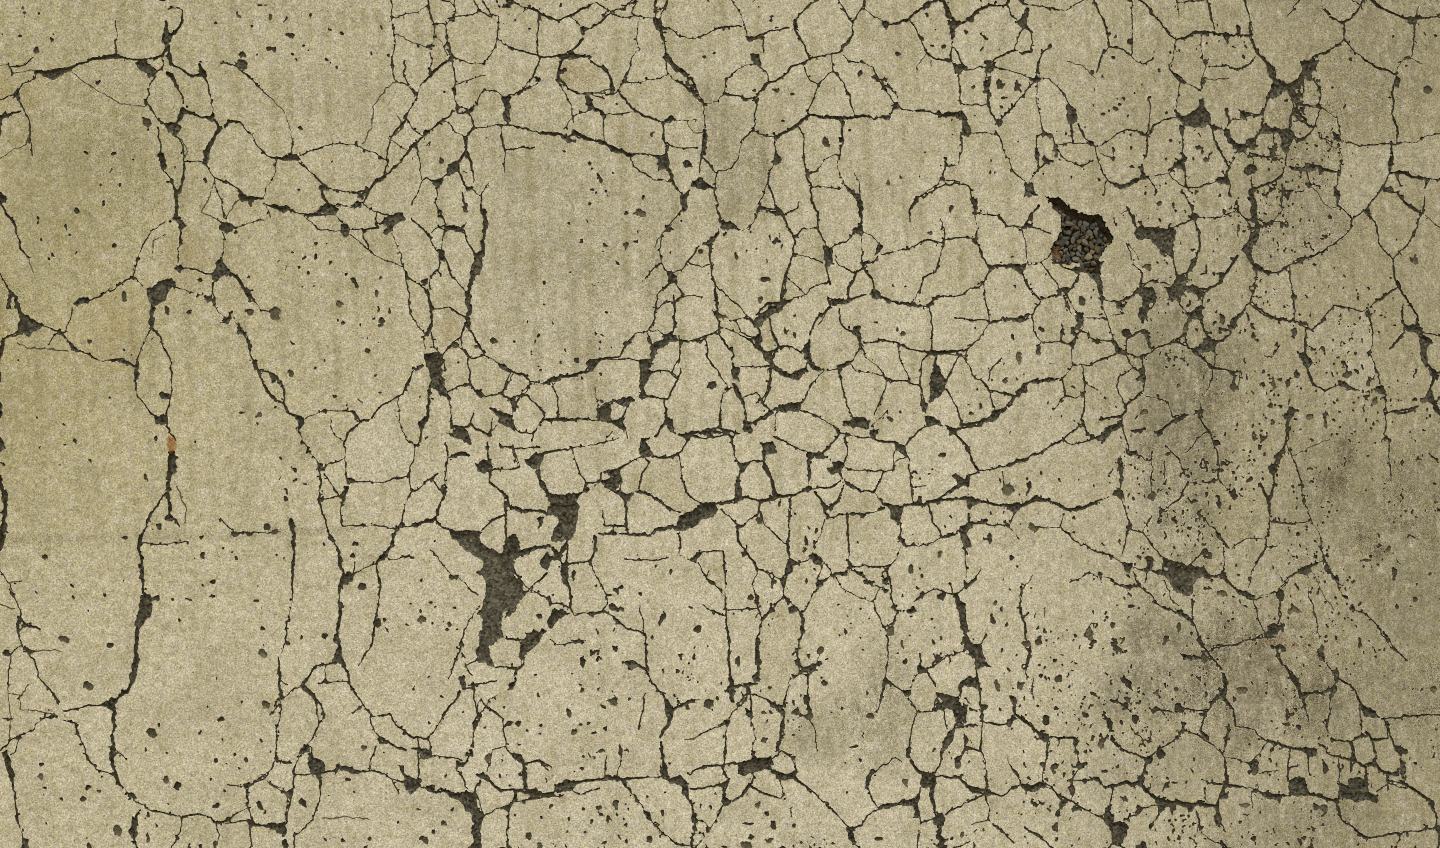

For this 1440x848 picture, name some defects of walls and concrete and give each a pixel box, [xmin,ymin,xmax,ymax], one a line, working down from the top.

spalling [237,4,309,70]
spalling [916,12,1000,70]
crack [0,570,61,848]
crack [0,6,295,441]
crack [63,450,293,848]
crack [293,676,786,848]
spalling [546,503,579,542]
spalling [734,233,783,304]
crack [235,0,1440,792]
spalling [958,321,1028,420]
crack [684,568,1440,848]
spalling [979,96,1440,848]